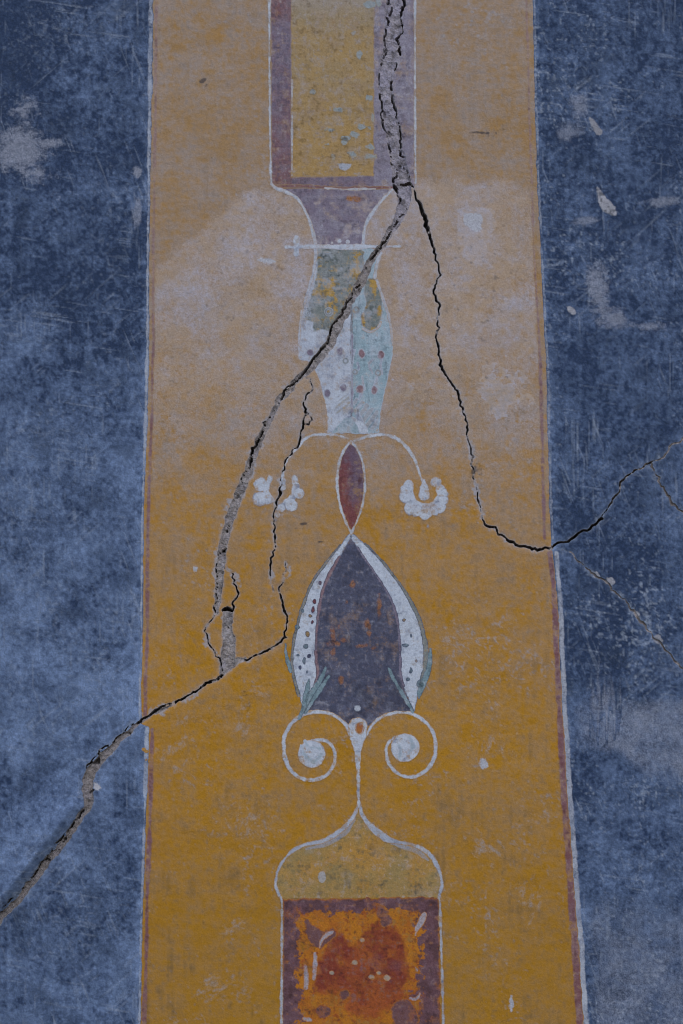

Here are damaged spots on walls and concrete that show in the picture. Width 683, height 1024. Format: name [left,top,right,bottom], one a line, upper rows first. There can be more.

crack [0,0,475,925]
crack [476,437,683,669]